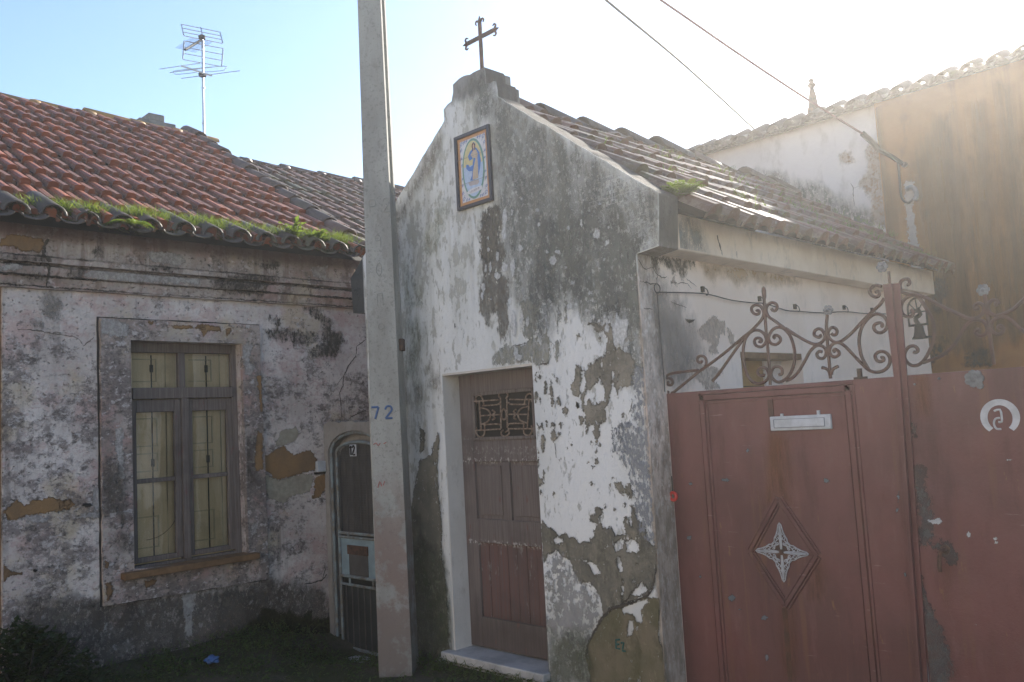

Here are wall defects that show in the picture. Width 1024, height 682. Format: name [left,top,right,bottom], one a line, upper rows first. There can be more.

peeling [481,198,524,301]
leakage [476,76,655,374]
flaking render [171,323,232,336]
leakage [265,307,345,358]
crack [337,340,366,421]
flaking render [3,496,92,520]
flaking render [254,431,325,499]
peeling [492,300,665,682]
leakage [413,540,451,658]